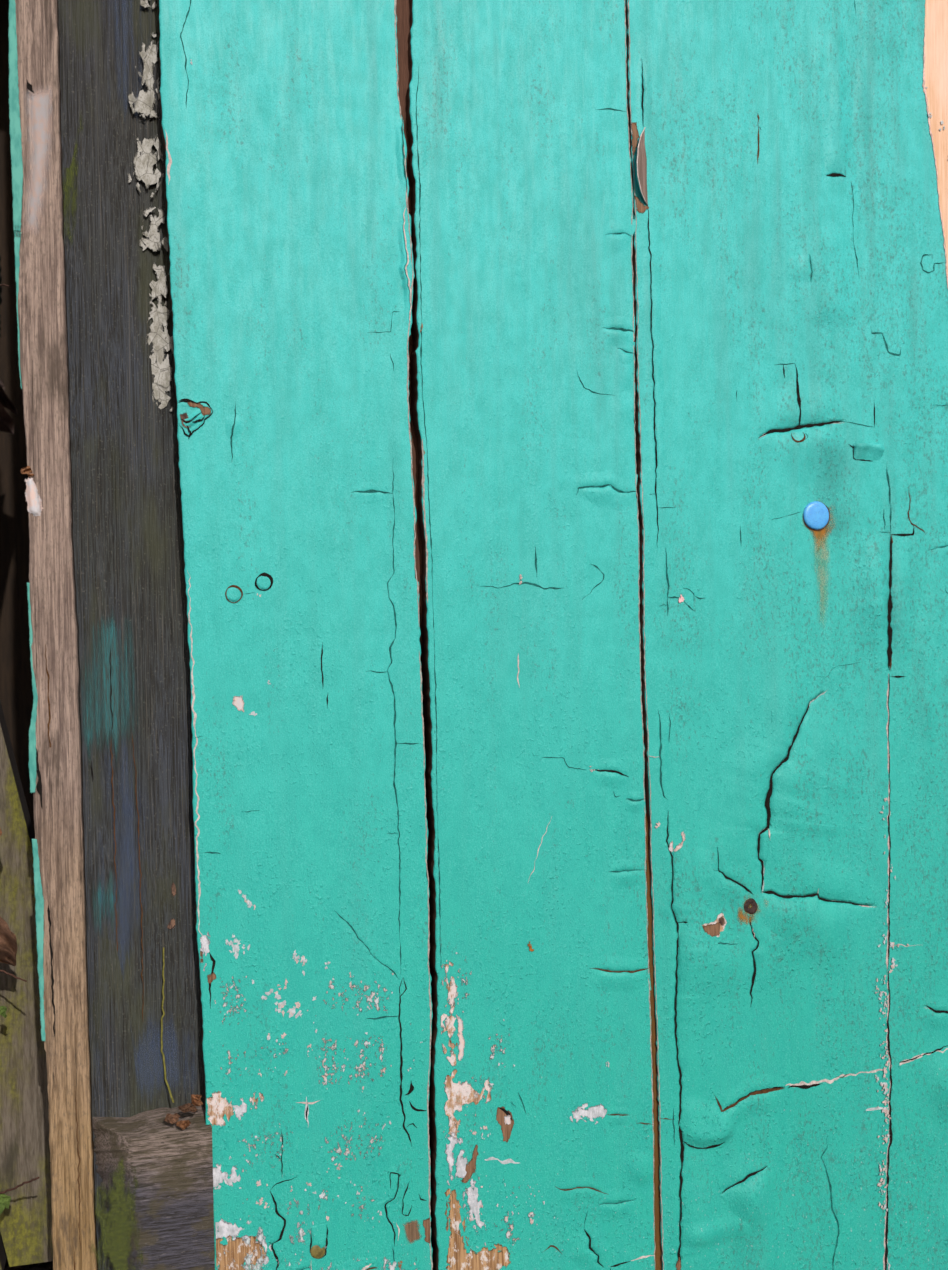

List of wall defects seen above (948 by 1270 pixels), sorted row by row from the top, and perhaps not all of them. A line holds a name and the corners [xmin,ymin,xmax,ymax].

peeling [631,122,639,155]
peeling [923,0,948,287]
peeling [634,194,649,213]
peeling [128,32,191,428]
rust [803,503,830,550]
crack [543,363,948,1270]
spalling [200,932,394,1092]
peeling [207,1091,264,1127]
peeling [441,952,558,1270]
peeling [405,1218,430,1244]
peeling [353,1257,416,1270]